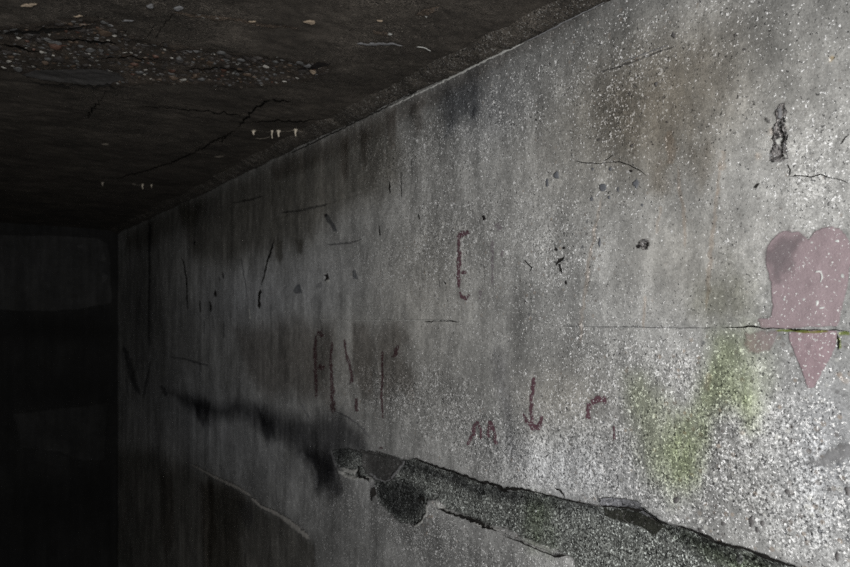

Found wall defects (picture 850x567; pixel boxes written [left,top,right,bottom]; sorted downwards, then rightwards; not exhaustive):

crack [115,2,604,180]
spalling [766,103,789,163]
crack [787,164,846,182]
spalling [332,448,793,567]